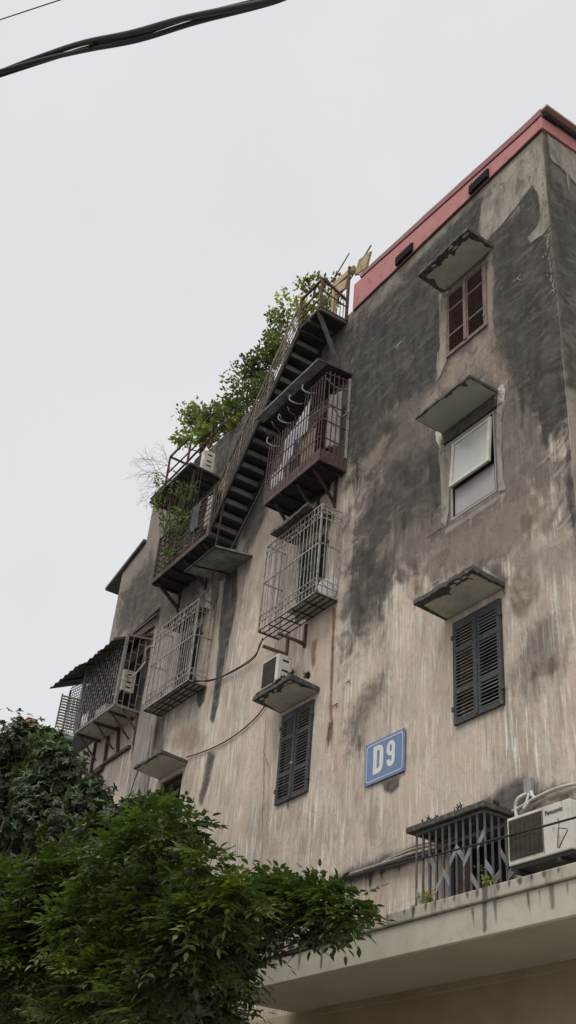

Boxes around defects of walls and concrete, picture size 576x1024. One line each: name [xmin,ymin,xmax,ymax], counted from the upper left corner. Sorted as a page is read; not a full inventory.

peeling [417,134,576,532]
damp [480,141,576,447]
damp [119,489,237,722]
damp [349,452,439,621]
peeling [424,574,503,619]
damp [566,449,576,536]